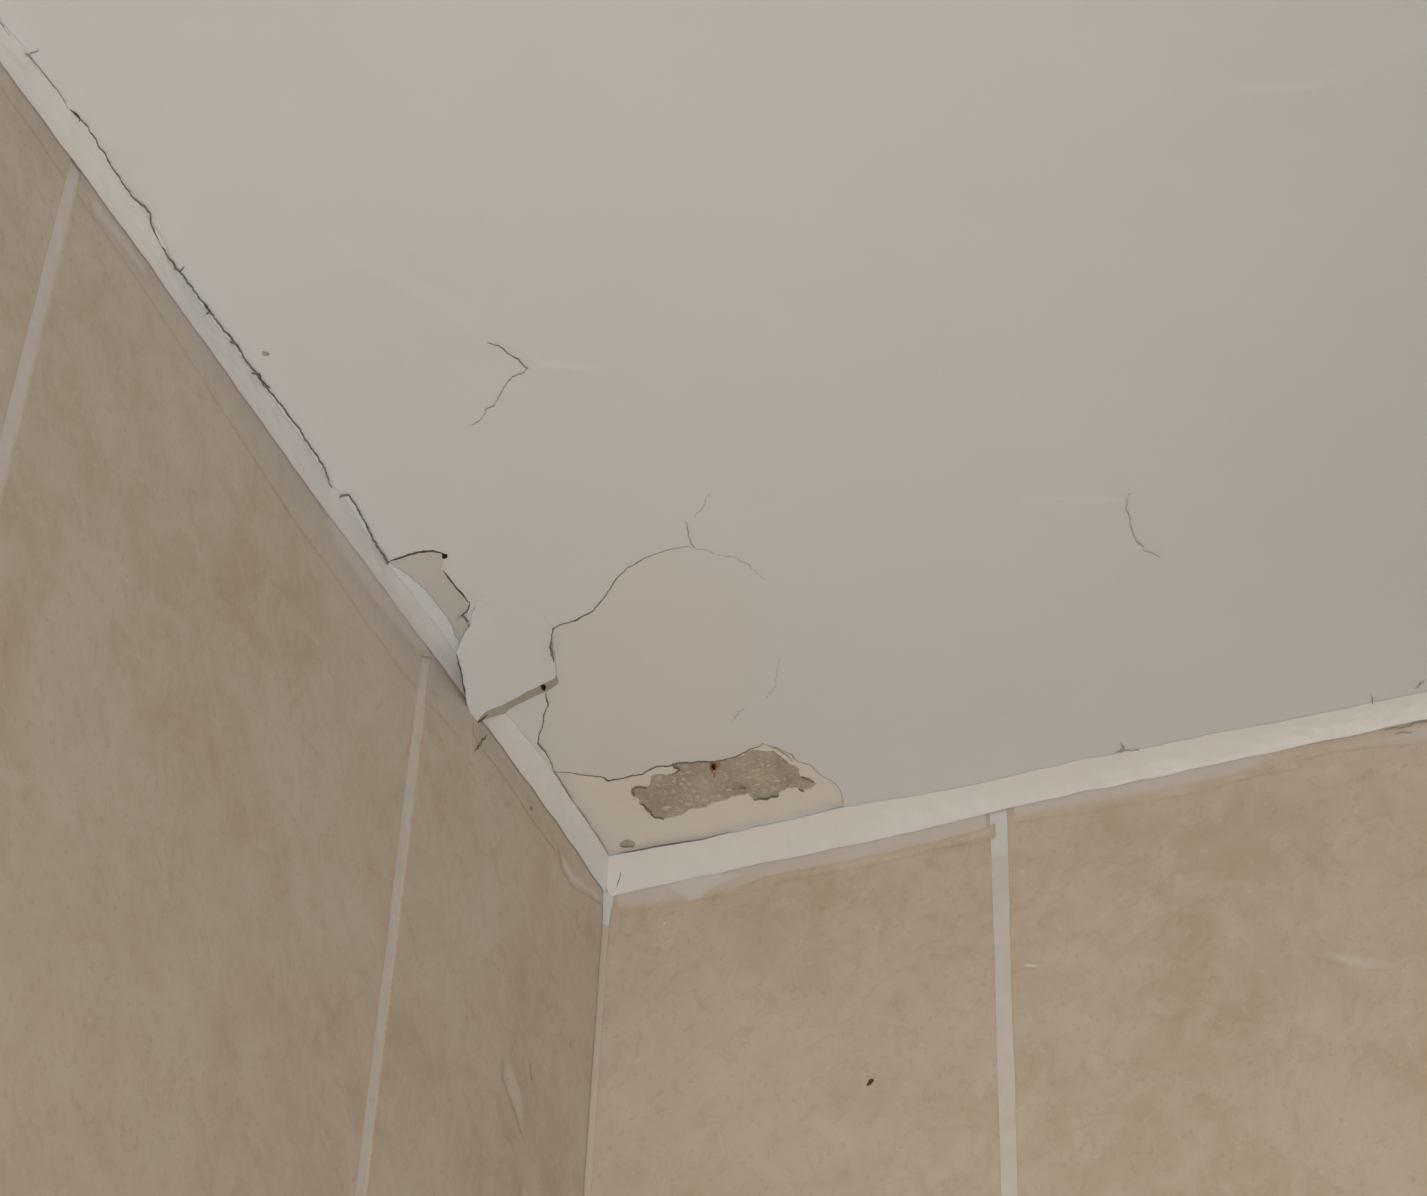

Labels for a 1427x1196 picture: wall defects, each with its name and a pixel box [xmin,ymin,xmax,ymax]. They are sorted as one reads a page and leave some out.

crack [0,22,389,565]
crack [471,342,528,425]
peeling [388,546,844,853]